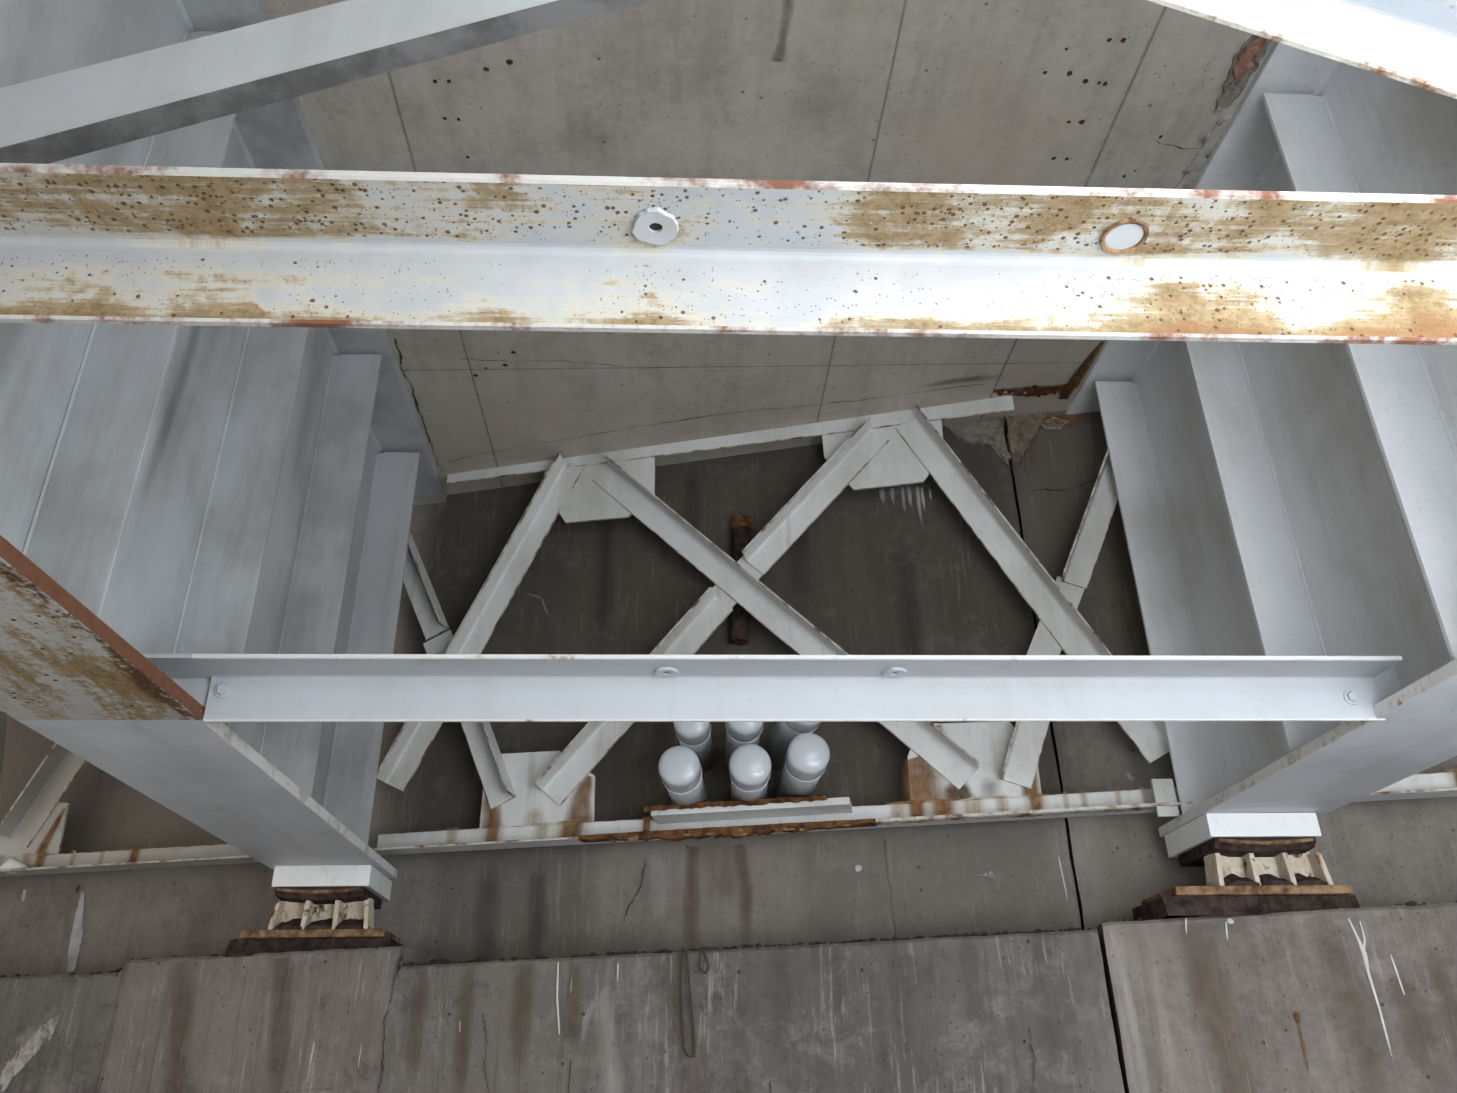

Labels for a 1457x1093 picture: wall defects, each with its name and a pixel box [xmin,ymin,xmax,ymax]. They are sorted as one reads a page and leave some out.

spalling [1174,34,1273,189]
rust [993,341,1104,427]
rust [484,795,500,842]
rust [563,756,1176,922]